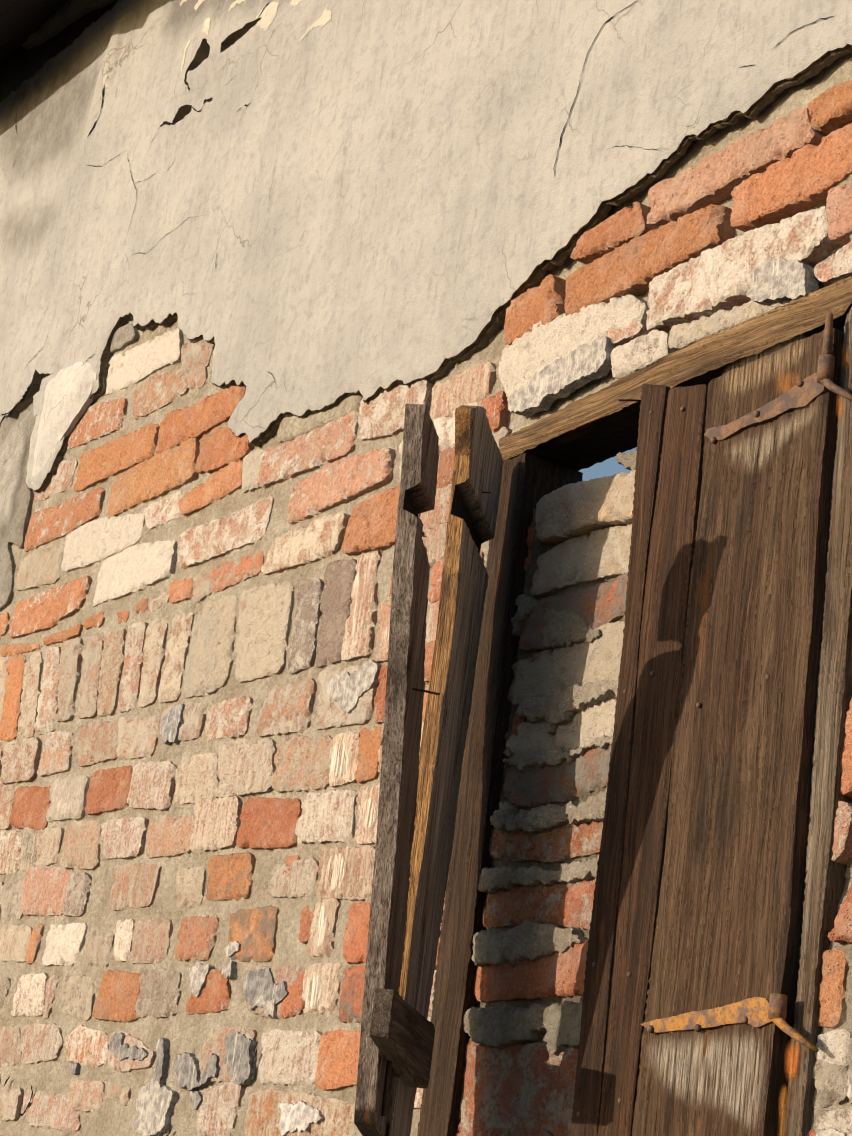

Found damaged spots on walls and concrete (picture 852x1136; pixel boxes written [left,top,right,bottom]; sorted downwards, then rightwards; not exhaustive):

peeling [256,0,302,31]
crack [553,0,637,182]
flaking render [211,44,852,448]
flaking render [89,312,215,406]
flaking render [25,419,80,493]
peeling [327,659,382,713]
peeling [160,704,185,746]
peeling [188,941,289,1019]
peeling [70,1062,81,1075]
peeling [109,1032,258,1136]
peeling [277,1100,325,1136]
rust [788,1045,798,1077]